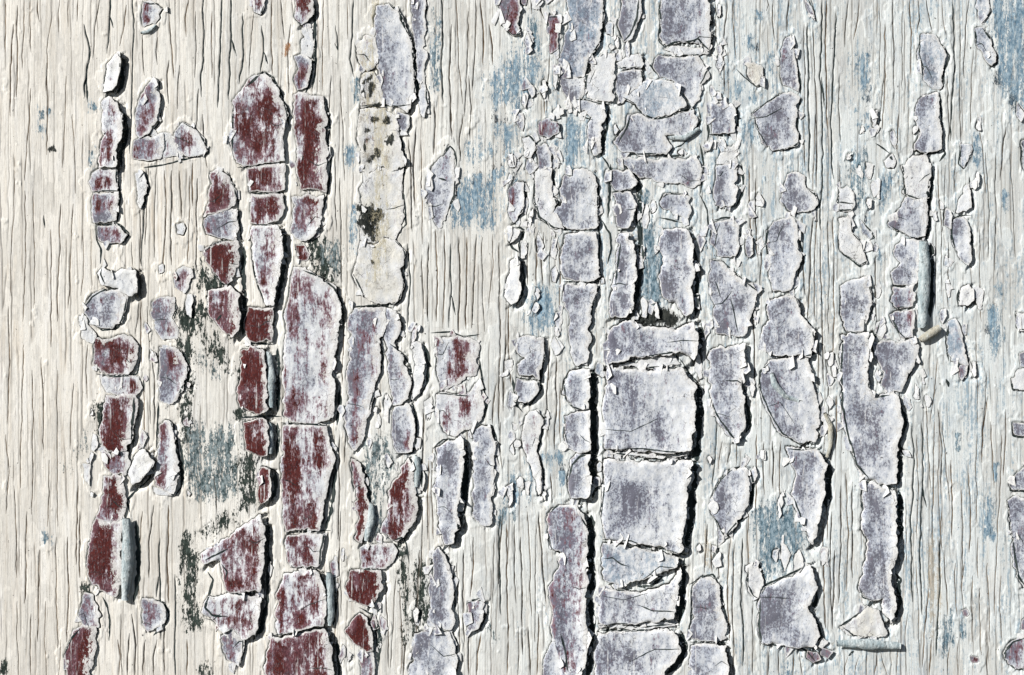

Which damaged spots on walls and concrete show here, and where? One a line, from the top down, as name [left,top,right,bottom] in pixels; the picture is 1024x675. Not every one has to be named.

peeling [140,0,168,34]
peeling [974,0,998,67]
peeling [63,52,209,675]
crack [5,0,354,675]
leakage [173,258,263,633]
crack [407,0,511,466]
crack [456,348,561,675]
peeling [198,0,984,675]
crack [704,423,802,675]
crack [822,473,853,628]
crack [766,0,1015,450]
crack [844,345,1006,675]